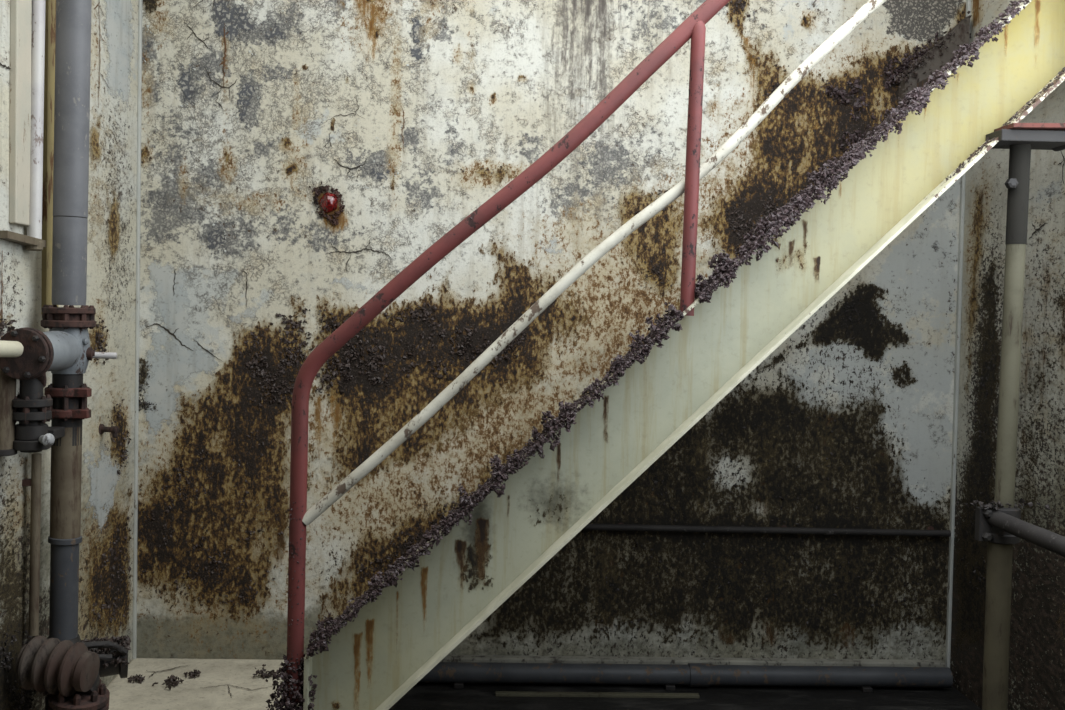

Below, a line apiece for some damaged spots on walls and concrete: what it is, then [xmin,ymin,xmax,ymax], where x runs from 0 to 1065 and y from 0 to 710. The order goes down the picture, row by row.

mould [0,492,37,710]
crack [146,323,223,362]
corrosion [137,295,359,623]
corrosion [315,420,542,629]
corrosion [307,240,592,491]
mould [469,258,1000,653]
corrosion [773,221,821,279]
corrosion [700,0,949,259]